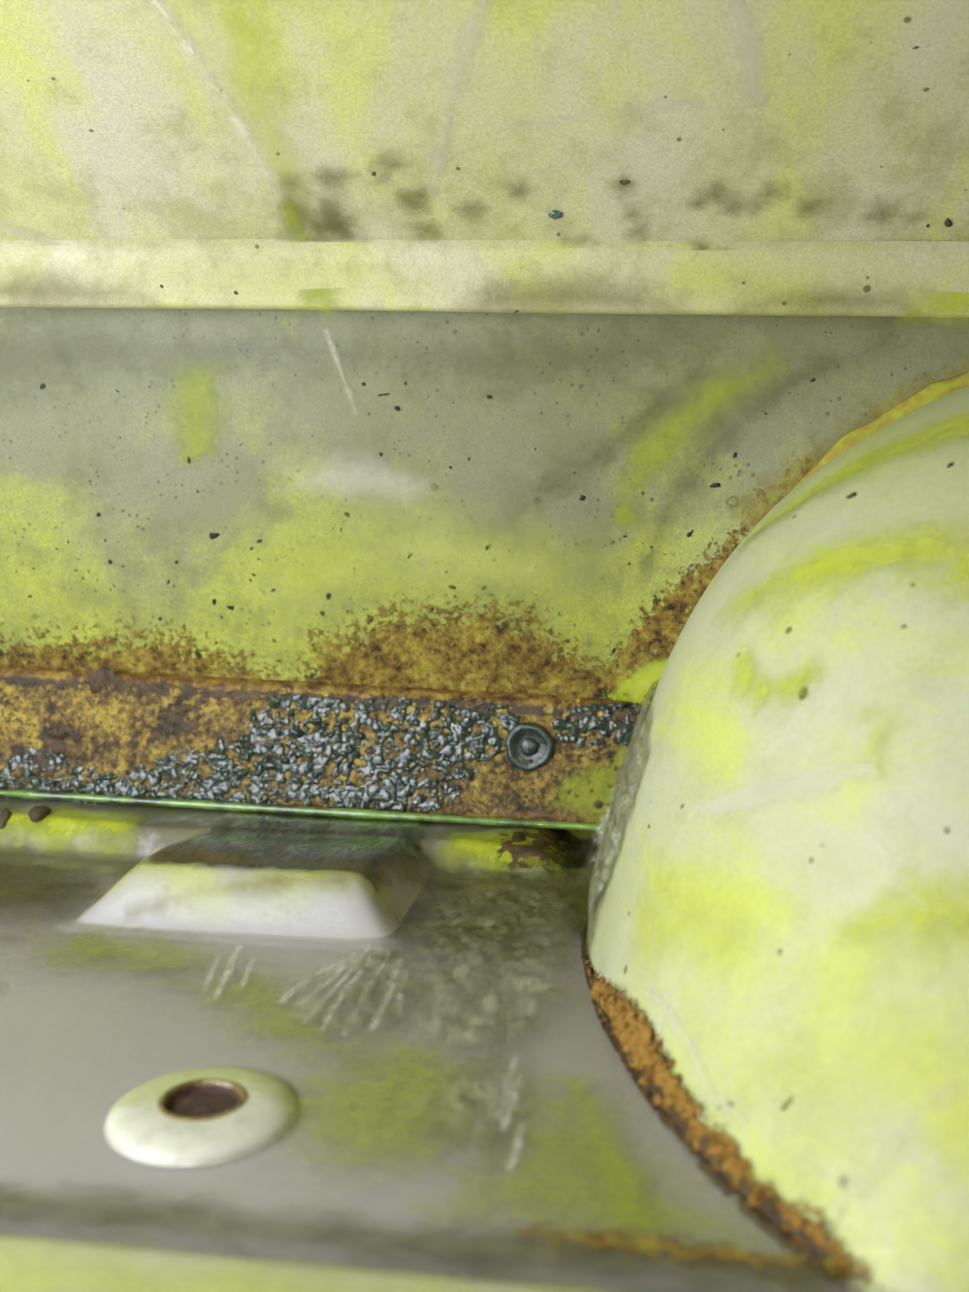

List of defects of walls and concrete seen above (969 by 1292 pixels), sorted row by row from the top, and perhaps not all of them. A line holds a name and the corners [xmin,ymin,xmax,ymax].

corrosion [0,452,826,822]
corrosion [581,875,882,1289]